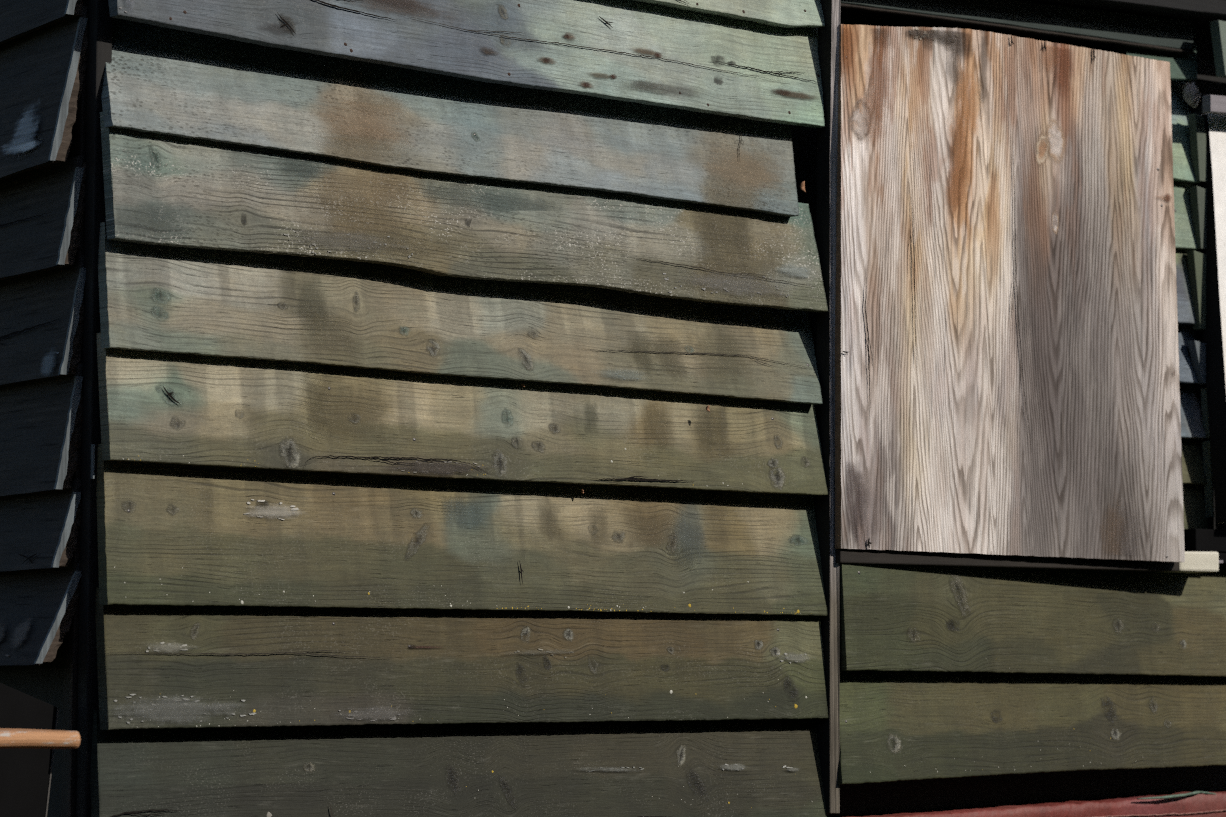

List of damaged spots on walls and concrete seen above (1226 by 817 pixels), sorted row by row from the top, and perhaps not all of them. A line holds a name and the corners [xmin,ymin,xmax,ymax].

crack [315,0,819,83]
corrosion [582,73,616,87]
corrosion [776,89,813,98]
peeling [245,499,299,520]
peeling [146,642,188,652]
peeling [114,694,256,724]